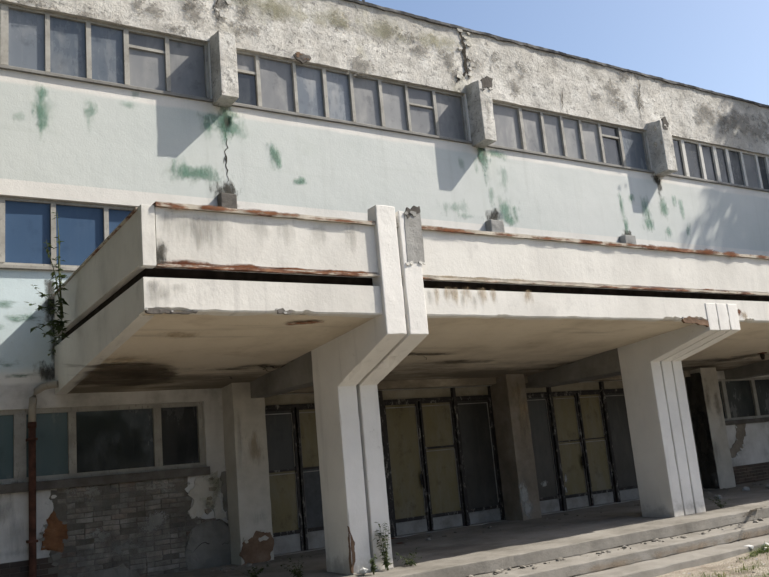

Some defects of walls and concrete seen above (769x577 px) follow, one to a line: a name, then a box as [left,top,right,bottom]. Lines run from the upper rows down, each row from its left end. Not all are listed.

crack [213,0,232,24]
crack [456,28,475,83]
crack [222,108,230,184]
rust [245,209,300,217]
rust [584,241,679,251]
leakage [79,363,176,386]
spalling [730,424,748,458]
spalling [39,471,229,577]
spalling [239,529,274,565]